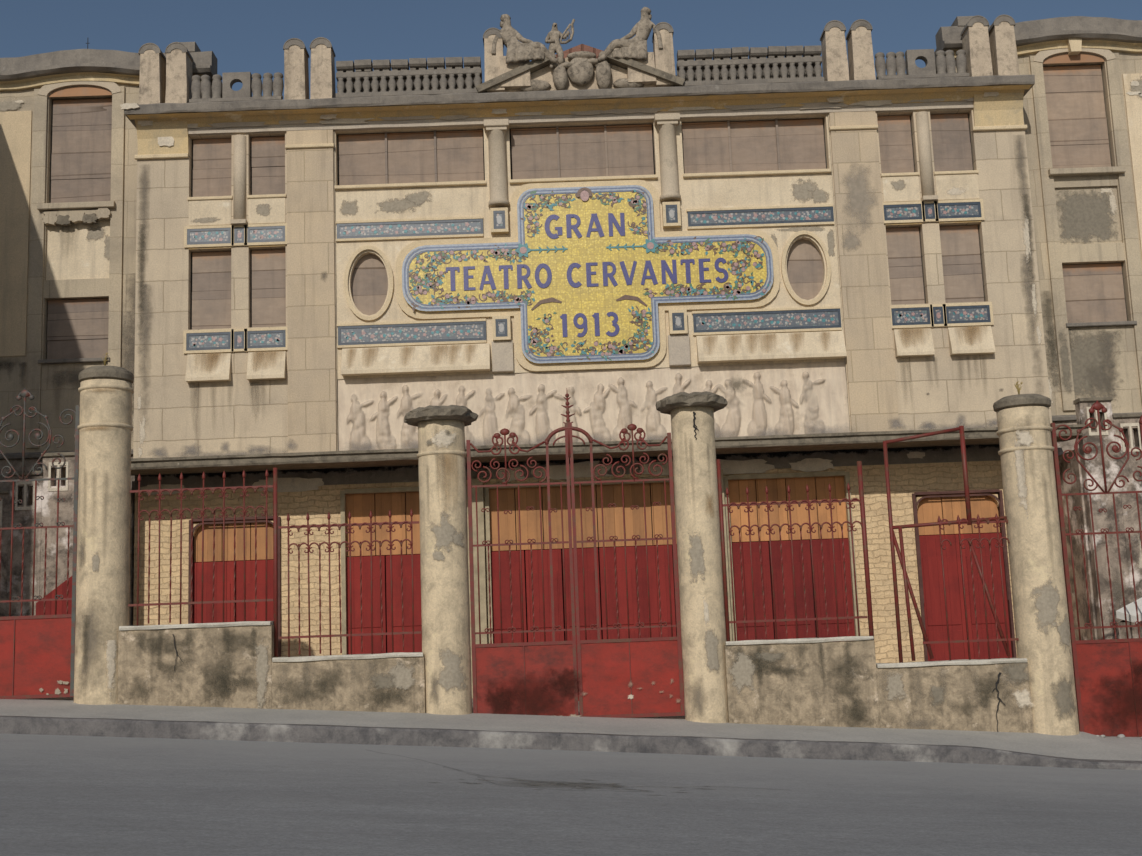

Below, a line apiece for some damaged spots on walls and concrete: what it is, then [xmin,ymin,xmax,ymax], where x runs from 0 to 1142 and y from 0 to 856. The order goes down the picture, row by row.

peeling [1126,76,1142,97]
spalling [341,200,358,215]
spalling [379,191,430,213]
damp [1018,141,1030,230]
peeling [1056,188,1118,244]
damp [1024,260,1117,397]
spalling [431,512,464,560]
peeling [688,533,705,583]
spalling [1032,581,1071,652]
crack [992,672,1006,732]